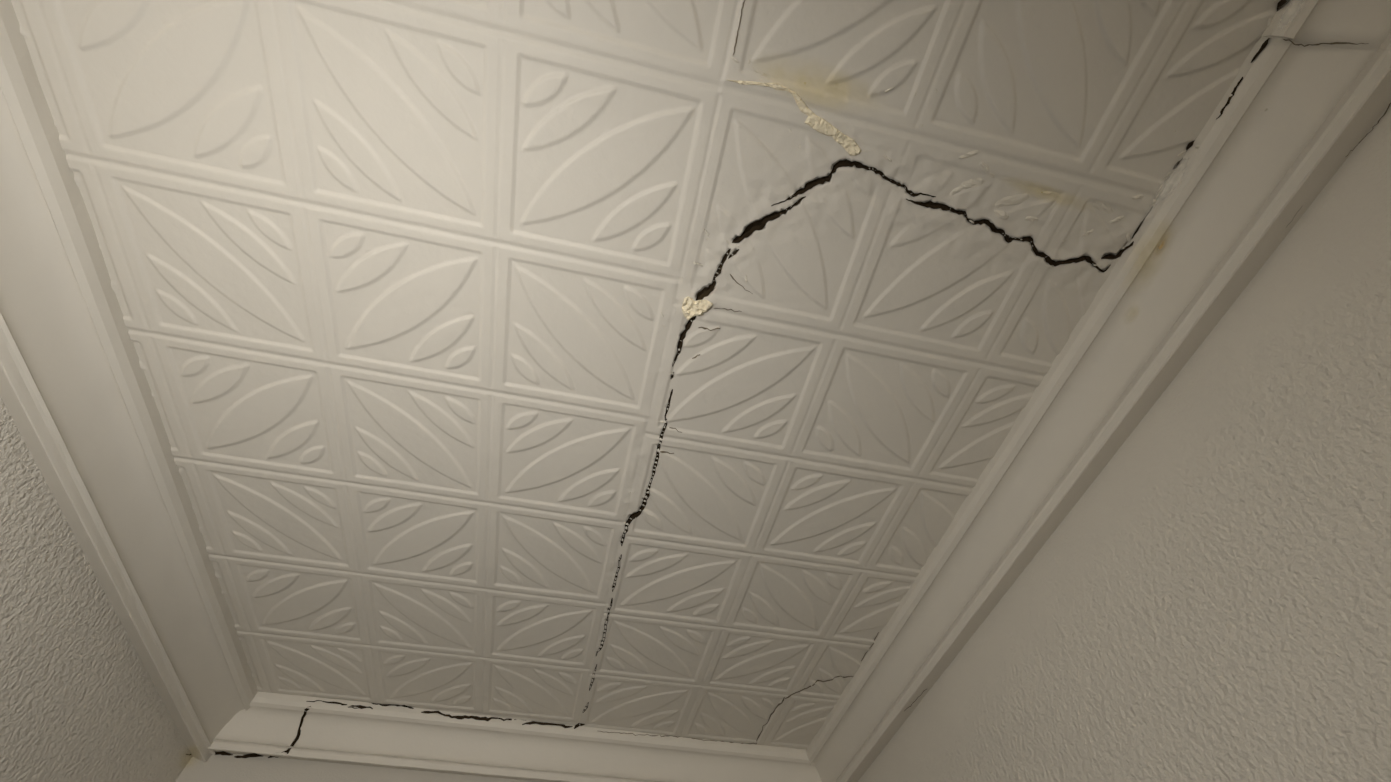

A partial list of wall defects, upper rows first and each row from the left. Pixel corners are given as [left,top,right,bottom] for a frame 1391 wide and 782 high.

crack [733,0,745,55]
crack [1217,0,1369,119]
crack [186,130,1200,758]